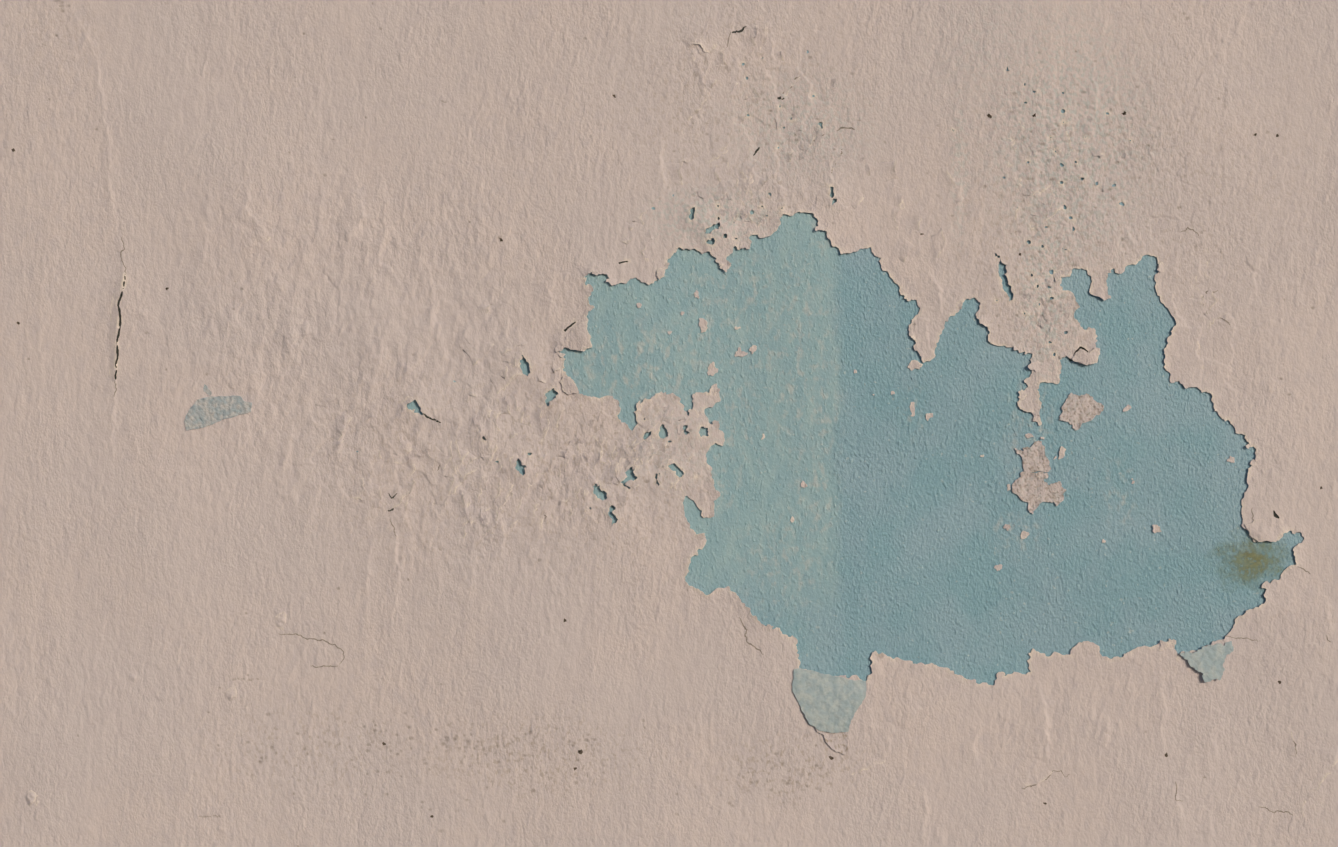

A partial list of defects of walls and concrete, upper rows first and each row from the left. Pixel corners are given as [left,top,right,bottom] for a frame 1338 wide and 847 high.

crack [109,237,126,395]
peeling [184,384,252,431]
peeling [555,207,1304,760]